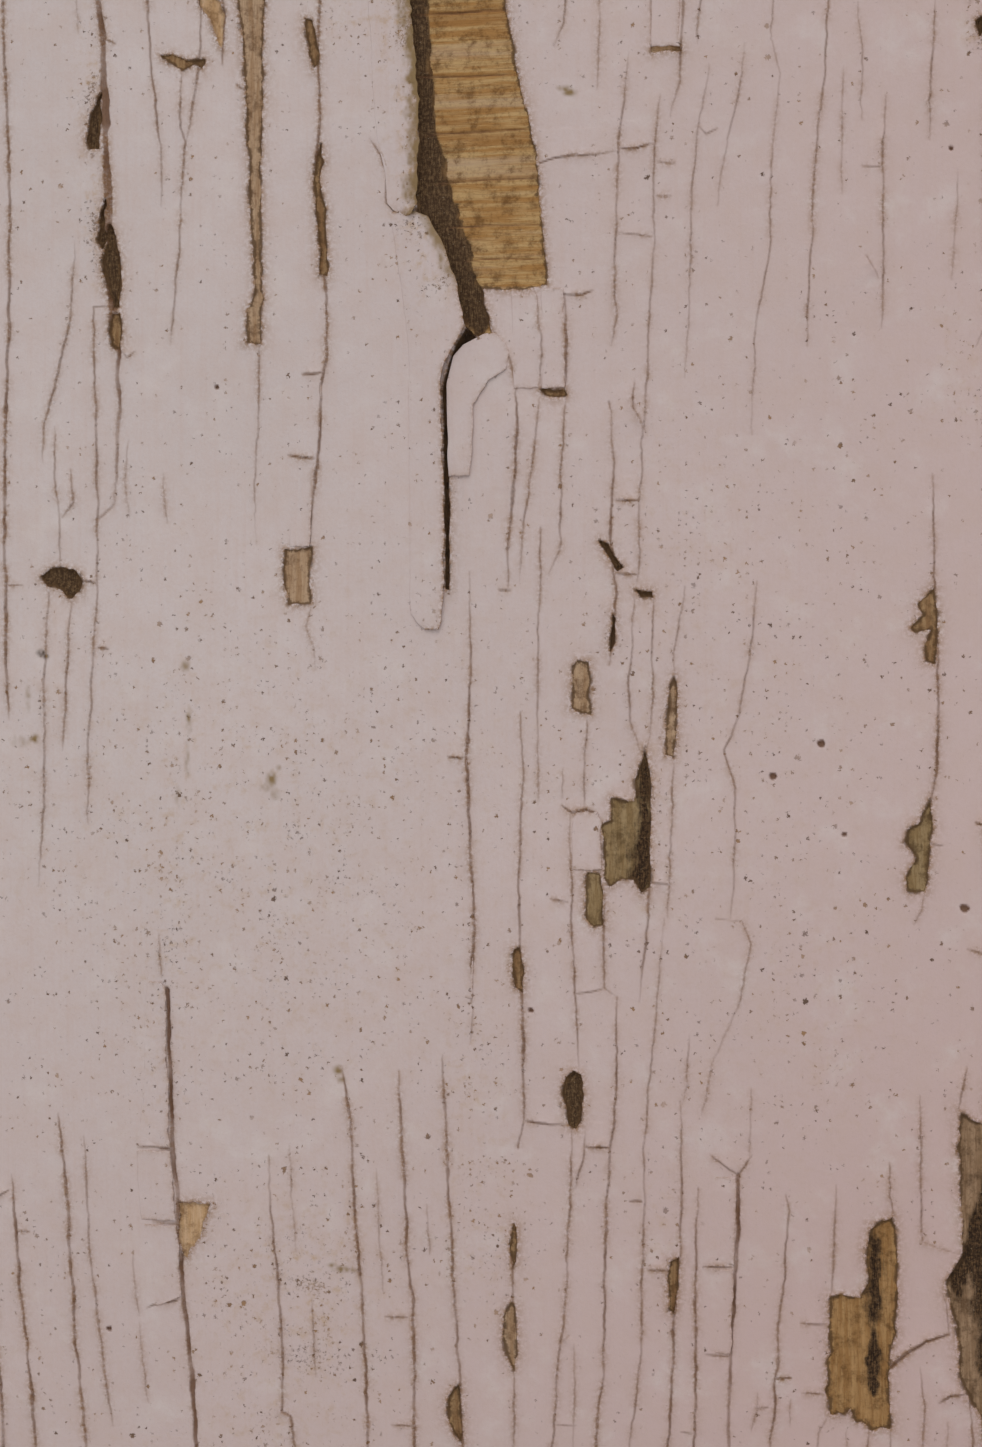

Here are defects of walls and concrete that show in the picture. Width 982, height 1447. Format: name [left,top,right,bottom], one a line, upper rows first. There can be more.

crack [0,0,207,826]
crack [56,1114,151,1447]
peeling [137,934,213,1447]
crack [283,0,331,672]
crack [332,387,566,1447]
peeling [368,0,616,630]
peeling [524,588,687,1447]
crack [571,581,760,1447]
crack [552,0,783,757]
peeling [800,1163,900,1447]
peeling [904,475,944,926]
peeling [918,1111,982,1447]